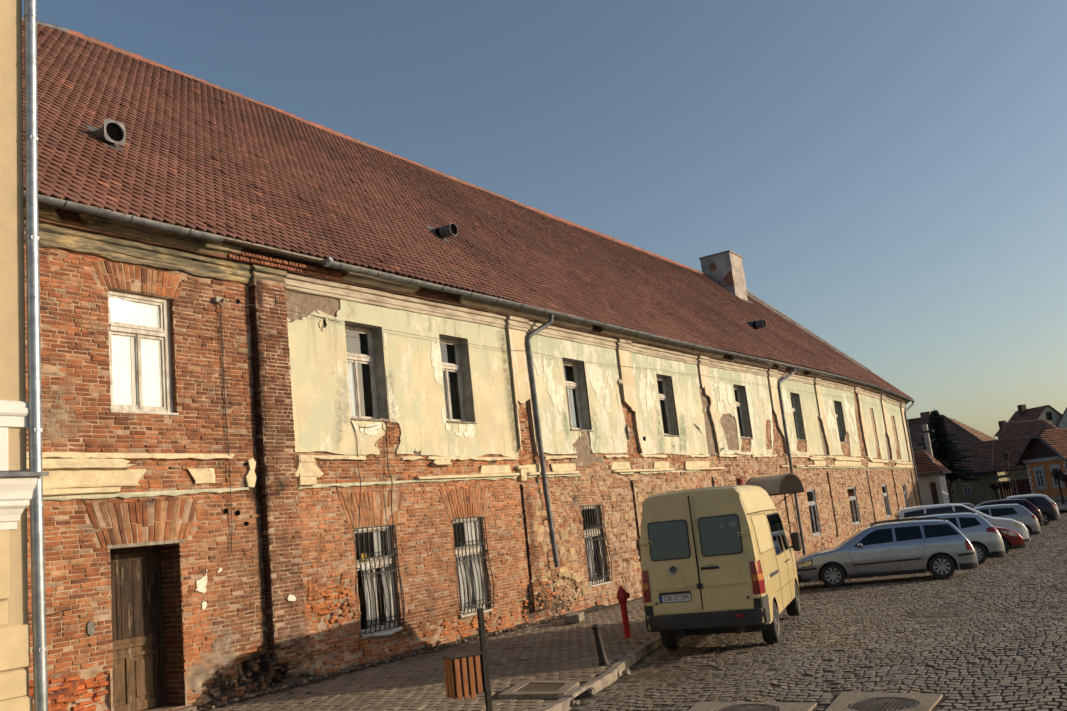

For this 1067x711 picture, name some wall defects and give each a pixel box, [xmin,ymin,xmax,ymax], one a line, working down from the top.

flaking render [286,290,340,331]
flaking render [350,368,402,475]
flaking render [515,400,539,465]
flaking render [571,431,604,467]
peeling [586,363,673,461]
flaking render [699,377,807,457]
spalling [48,670,109,711]
damp [193,645,311,701]